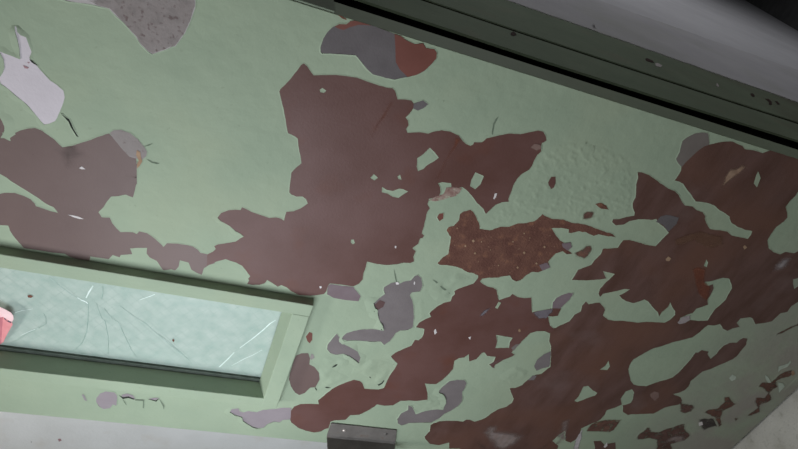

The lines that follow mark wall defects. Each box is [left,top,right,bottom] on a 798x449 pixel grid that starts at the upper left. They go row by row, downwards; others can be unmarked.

peeling [59,0,197,55]
peeling [0,20,547,302]
rust [437,203,616,282]
peeling [224,132,798,449]
peeling [82,391,119,410]
rust [699,361,795,430]